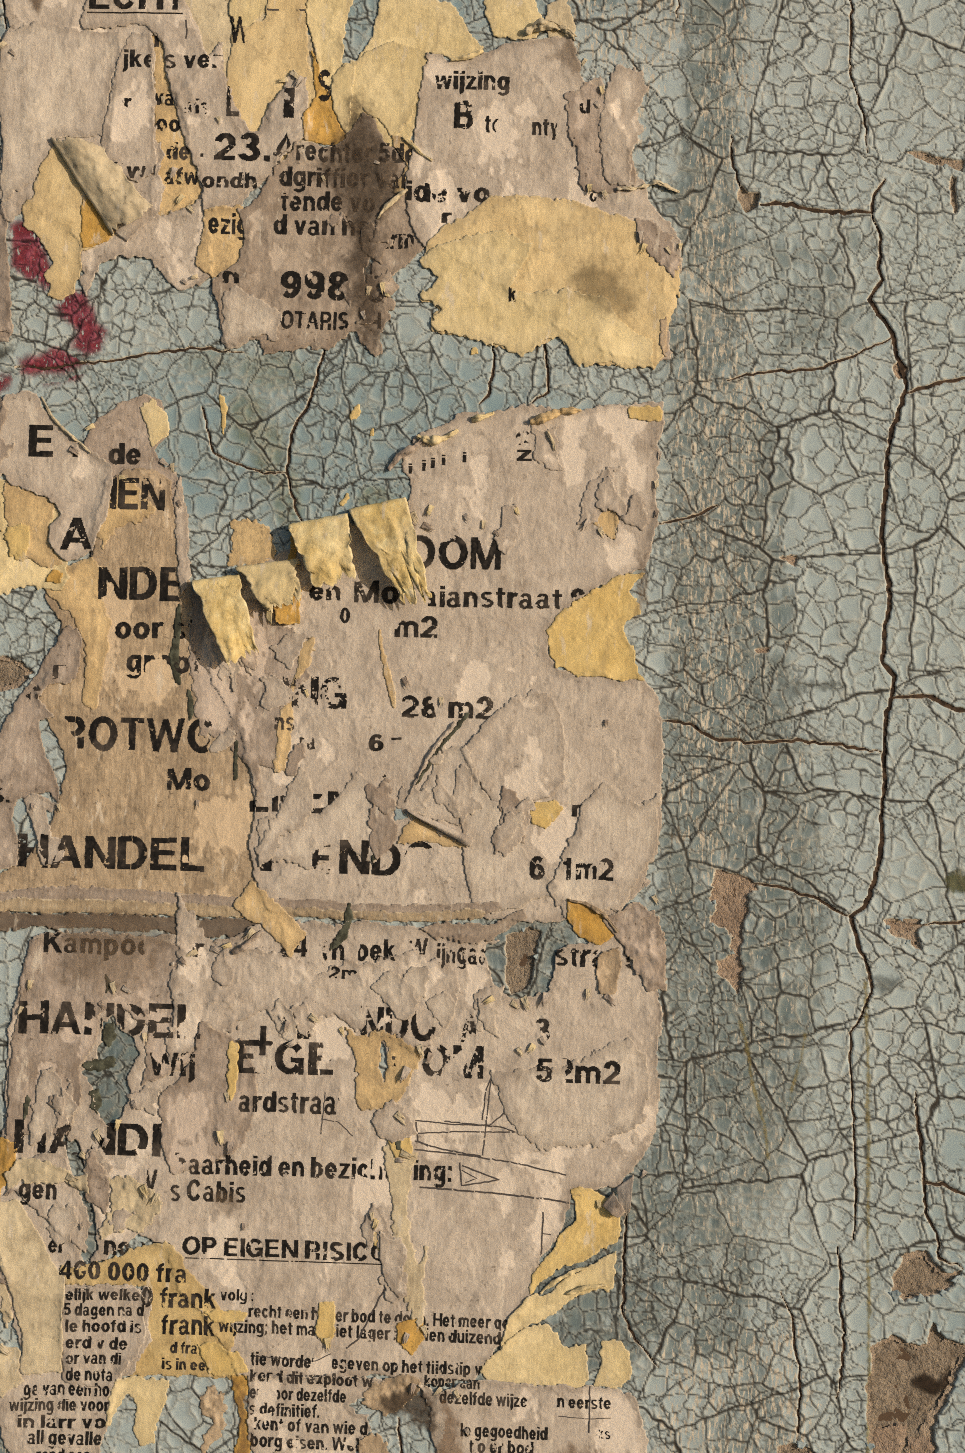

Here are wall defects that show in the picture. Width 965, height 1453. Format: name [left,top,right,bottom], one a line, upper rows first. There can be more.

crack [17,347,244,371]
crack [479,346,496,404]
crack [532,344,550,403]
crack [202,349,326,521]
crack [659,0,965,1434]
peeling [709,870,757,993]
crack [621,1215,658,1367]
spalling [888,1250,963,1302]
spalling [865,1323,965,1453]
crack [396,1418,404,1453]
spalling [777,1441,815,1453]